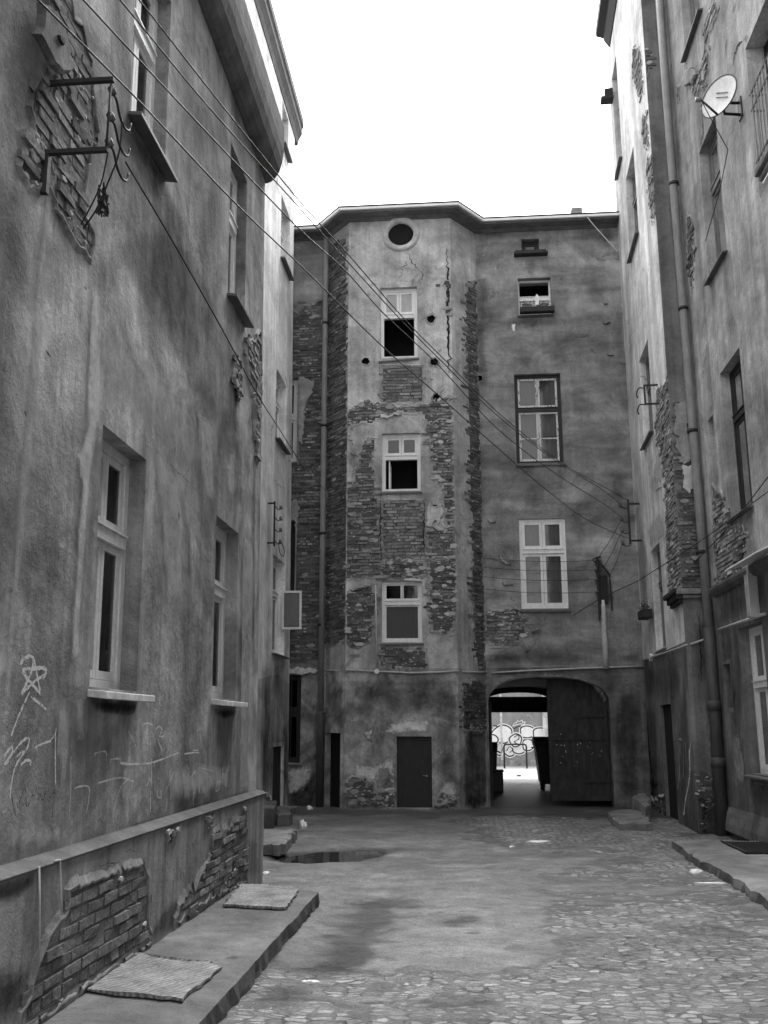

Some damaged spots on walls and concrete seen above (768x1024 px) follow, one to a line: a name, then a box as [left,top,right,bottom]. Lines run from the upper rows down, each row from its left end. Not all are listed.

flaking render [676,0,720,104]
flaking render [15,0,101,265]
flaking render [632,44,657,226]
crack [401,250,452,367]
flaking render [686,212,697,297]
flaking render [230,328,263,466]
flaking render [289,234,542,735]
flaking render [654,375,701,592]
flaking render [711,482,749,585]
flaking render [344,775,396,809]
flaking render [173,804,250,929]
flaking render [14,858,153,1024]